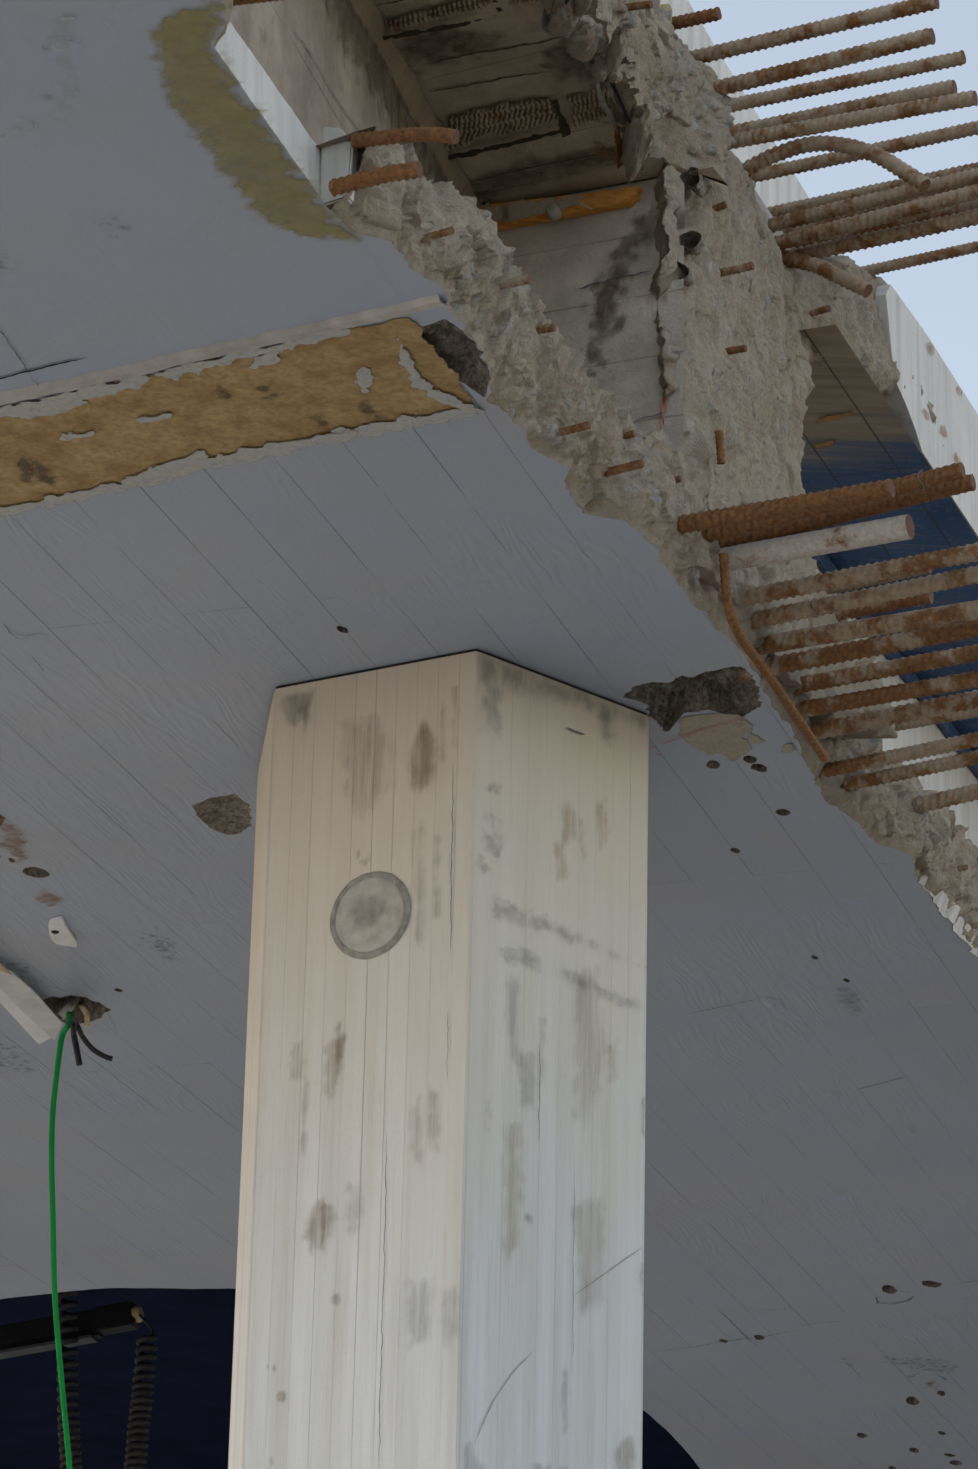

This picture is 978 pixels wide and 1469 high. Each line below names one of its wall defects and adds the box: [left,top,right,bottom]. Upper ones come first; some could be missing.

water stain [153,5,357,239]
spalling [596,0,978,298]
spalling [0,126,978,958]